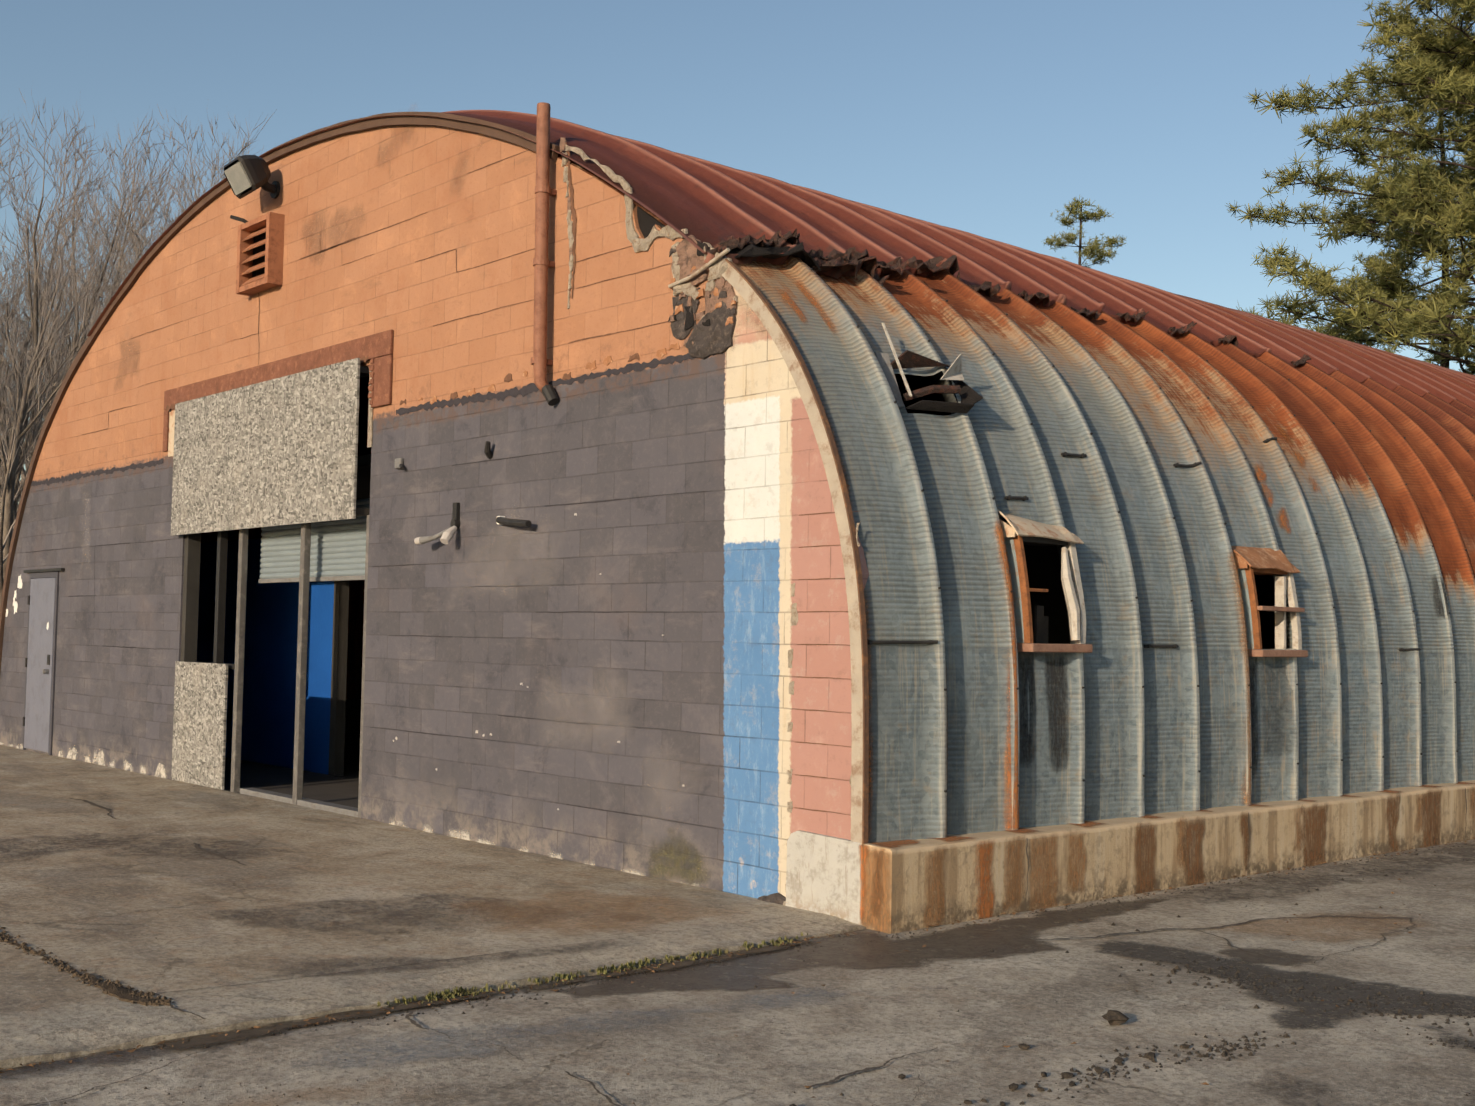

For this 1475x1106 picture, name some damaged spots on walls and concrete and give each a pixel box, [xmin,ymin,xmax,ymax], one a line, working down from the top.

crack [300,212,427,265]
crack [415,248,535,273]
crack [433,299,534,327]
spalling [396,137,1001,415]
peeling [1018,290,1050,306]
peeling [1071,306,1149,322]
peeling [1218,335,1238,346]
rust [860,524,1033,933]
rust [1231,555,1266,868]
rust [1295,799,1327,867]
rust [1380,782,1475,852]
crack [0,915,798,1019]